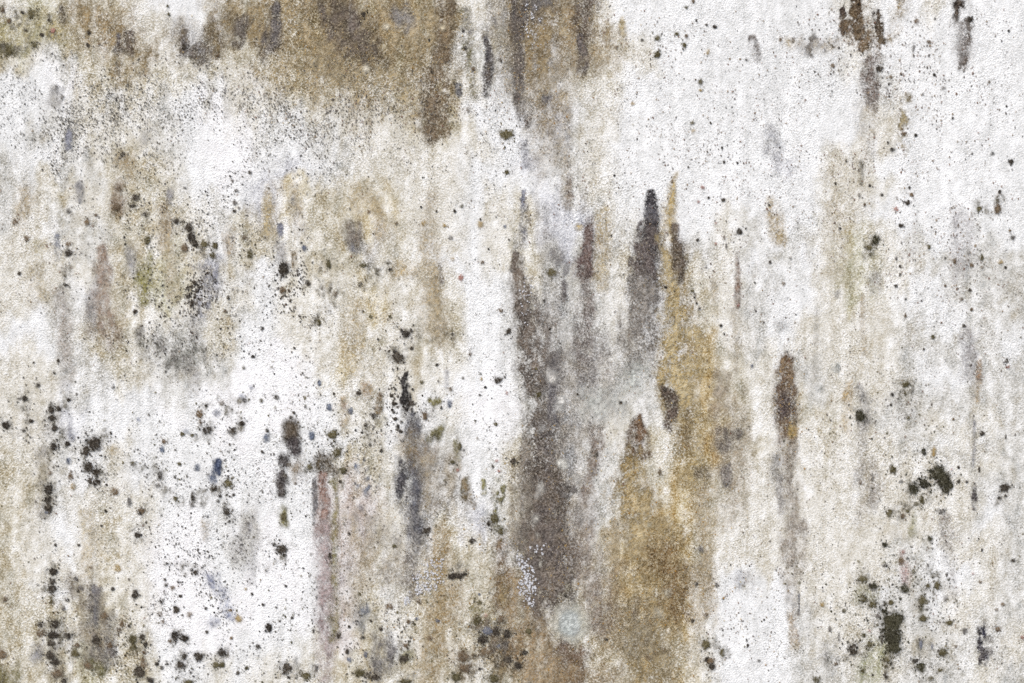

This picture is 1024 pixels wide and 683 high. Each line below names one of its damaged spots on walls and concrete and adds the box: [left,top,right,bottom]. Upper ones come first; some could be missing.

leakage [669,361,1024,683]